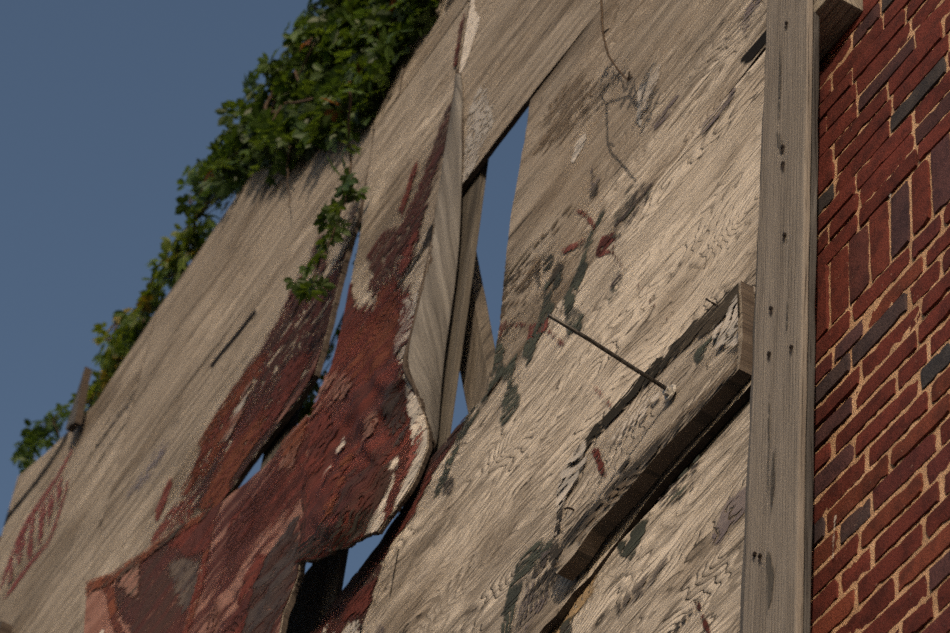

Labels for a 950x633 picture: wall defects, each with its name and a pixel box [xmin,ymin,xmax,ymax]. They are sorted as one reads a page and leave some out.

peeling [292,275,427,563]
peeling [84,501,223,633]
peeling [343,619,360,633]